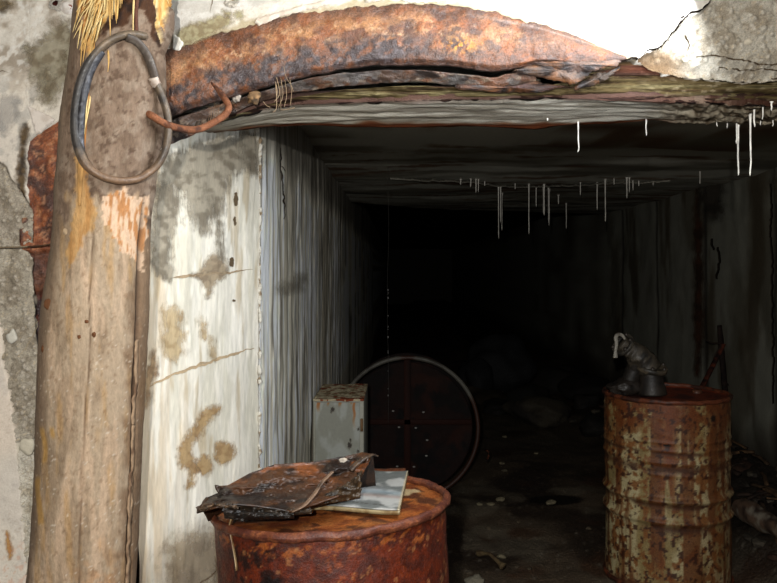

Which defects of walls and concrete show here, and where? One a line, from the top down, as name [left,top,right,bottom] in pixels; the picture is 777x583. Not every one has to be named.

leakage [0,0,12,13]
leakage [23,20,71,104]
rust [455,60,621,93]
spalling [638,0,777,83]
leakage [16,123,29,197]
spalling [0,162,38,574]
leakage [145,306,186,407]
leakage [201,322,217,359]
leakage [179,405,237,489]